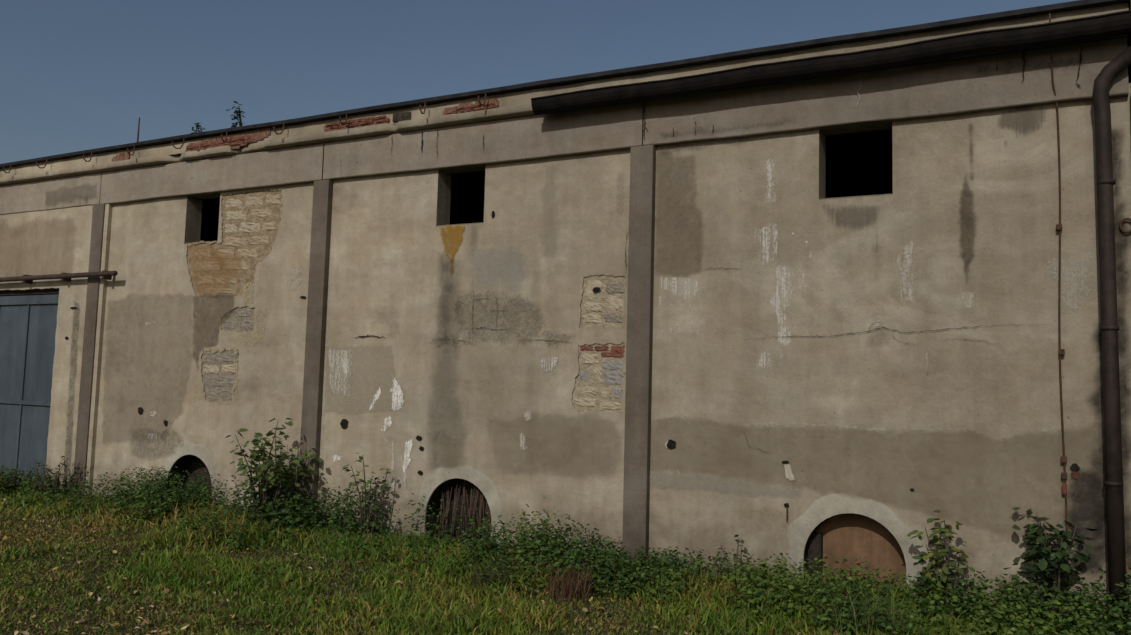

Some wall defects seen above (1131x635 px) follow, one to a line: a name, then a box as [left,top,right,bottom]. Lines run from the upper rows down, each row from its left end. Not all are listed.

flaking render [185,128,270,152]
flaking render [324,111,411,132]
flaking render [443,98,499,115]
flaking render [187,190,283,332]
corrosion [441,225,464,273]
damp [960,188,974,268]
flaking render [580,275,626,328]
crack [763,322,1053,345]
flaking render [202,350,239,403]
peeling [369,378,403,432]
flaking render [572,343,626,414]
peeling [402,435,424,475]